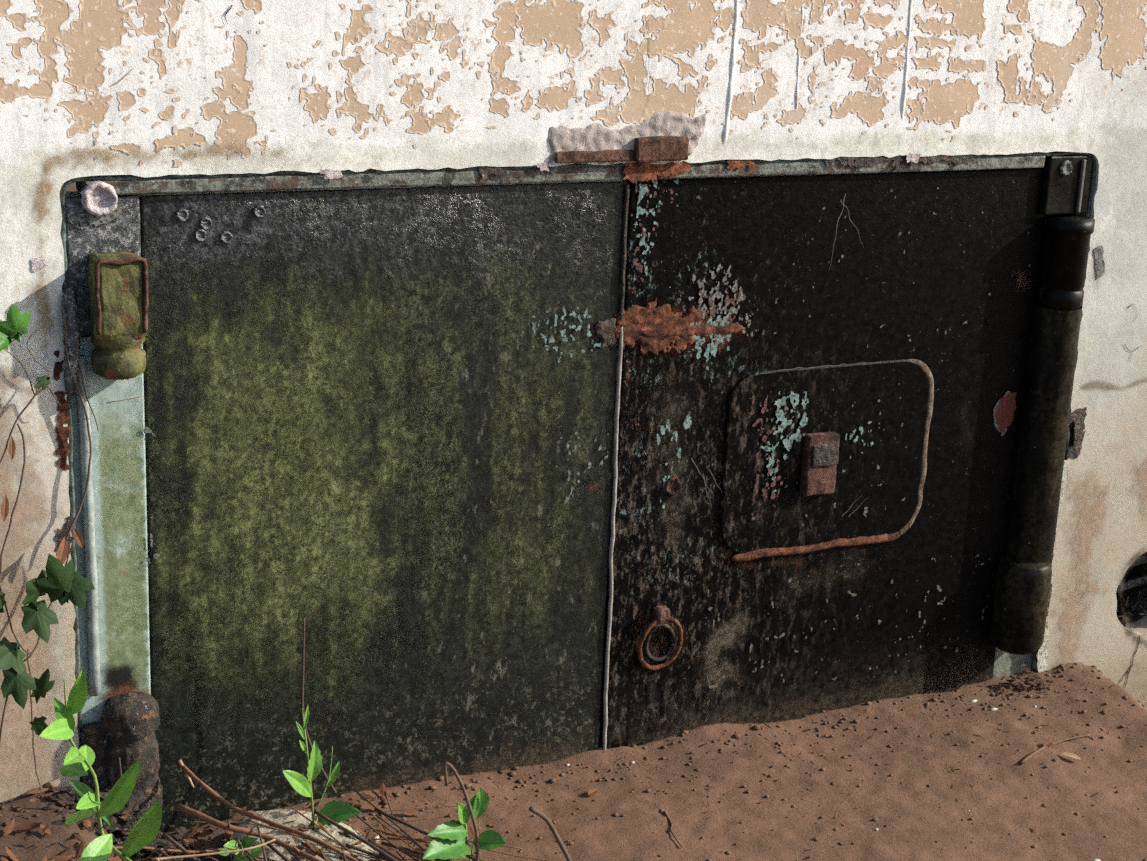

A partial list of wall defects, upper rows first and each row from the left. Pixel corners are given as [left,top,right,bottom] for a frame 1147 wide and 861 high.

peeling [0,0,278,221]
peeling [287,0,1147,172]
peeling [319,169,342,179]
rust [621,161,691,183]
peeling [631,179,679,301]
peeling [31,256,53,348]
peeling [669,264,776,370]
peeling [744,391,809,520]
peeling [842,399,885,473]